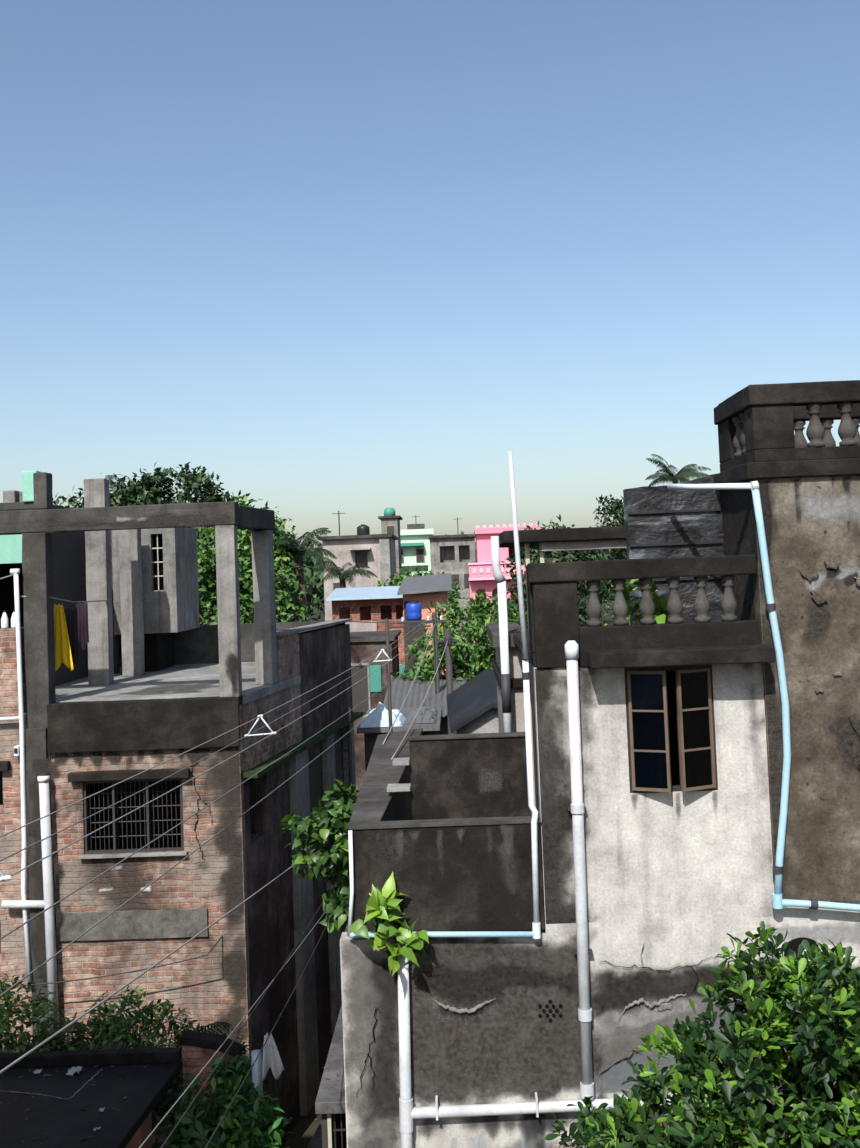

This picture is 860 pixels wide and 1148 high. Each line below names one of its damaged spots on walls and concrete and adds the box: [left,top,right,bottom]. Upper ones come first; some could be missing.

flaking render [800,560,860,605]
crack [191,766,213,862]
leakage [344,667,778,1148]
crack [600,944,748,992]
crack [356,1008,378,1098]